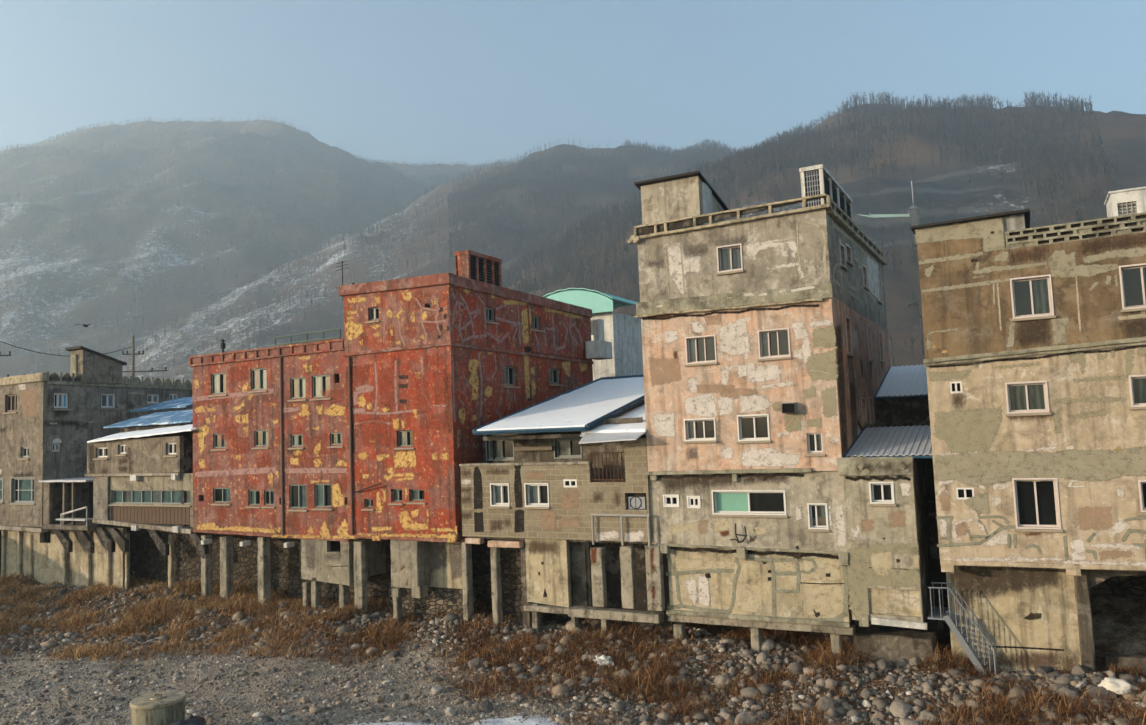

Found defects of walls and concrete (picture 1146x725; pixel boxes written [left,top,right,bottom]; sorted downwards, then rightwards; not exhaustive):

leakage [1012,248,1048,263]
leakage [1083,234,1146,253]
peeling [730,286,815,299]
crack [352,291,584,425]
peeling [462,289,583,399]
leakage [929,306,1146,368]
peeling [432,351,493,460]
peeling [650,315,839,481]
peeling [195,371,471,543]
peeling [596,530,645,542]
crack [936,513,1146,564]
crack [666,554,915,621]